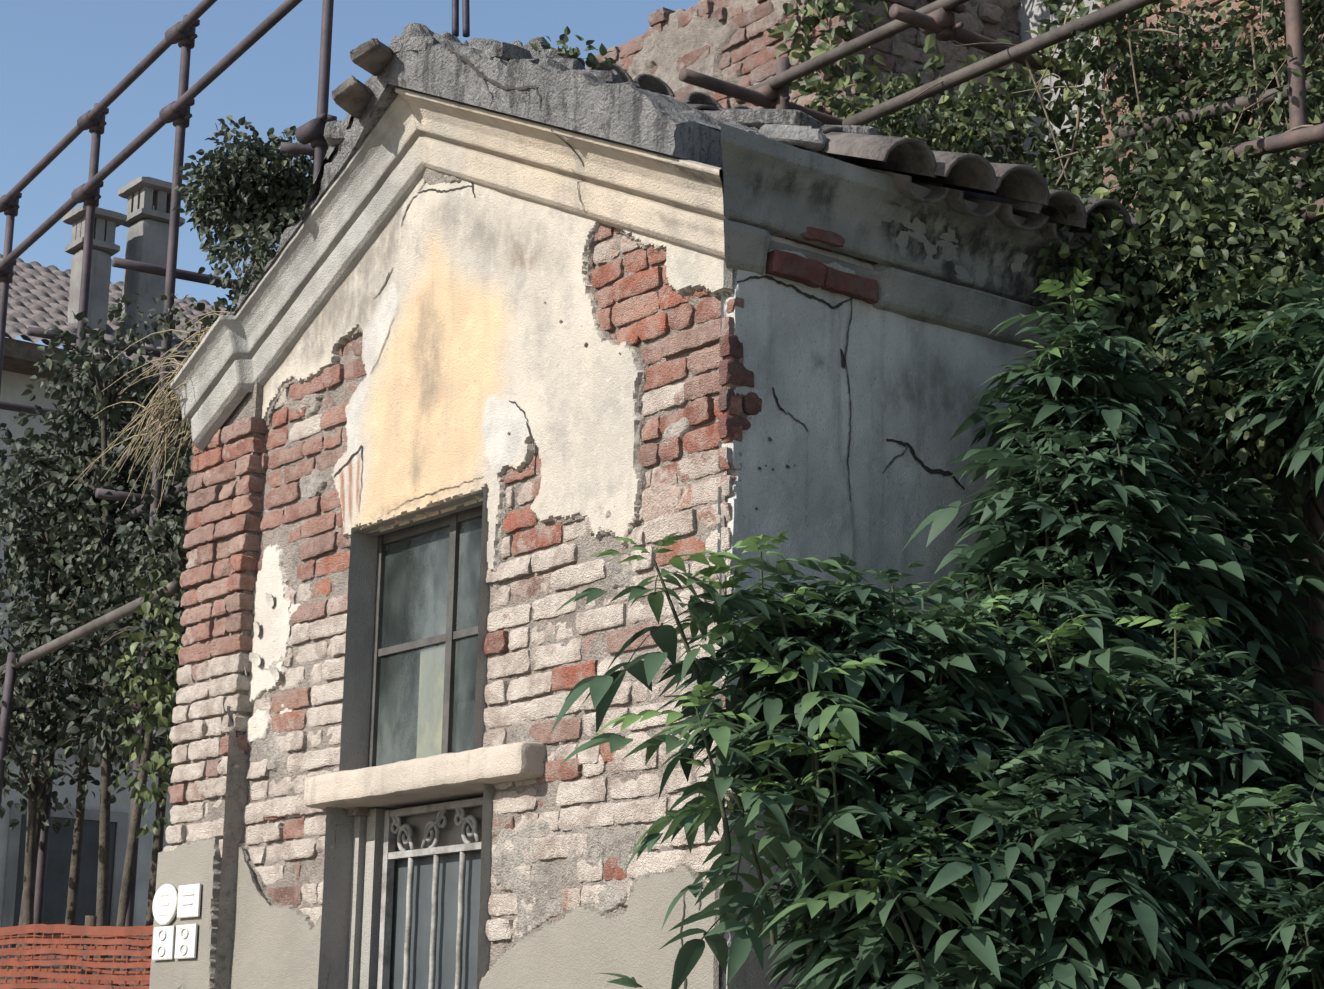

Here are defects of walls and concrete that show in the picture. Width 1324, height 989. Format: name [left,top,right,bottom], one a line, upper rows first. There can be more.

spalling [765,227,879,304]
crack [736,275,853,500]
crack [882,438,965,490]
spalling [163,326,366,927]
spalling [483,223,762,951]